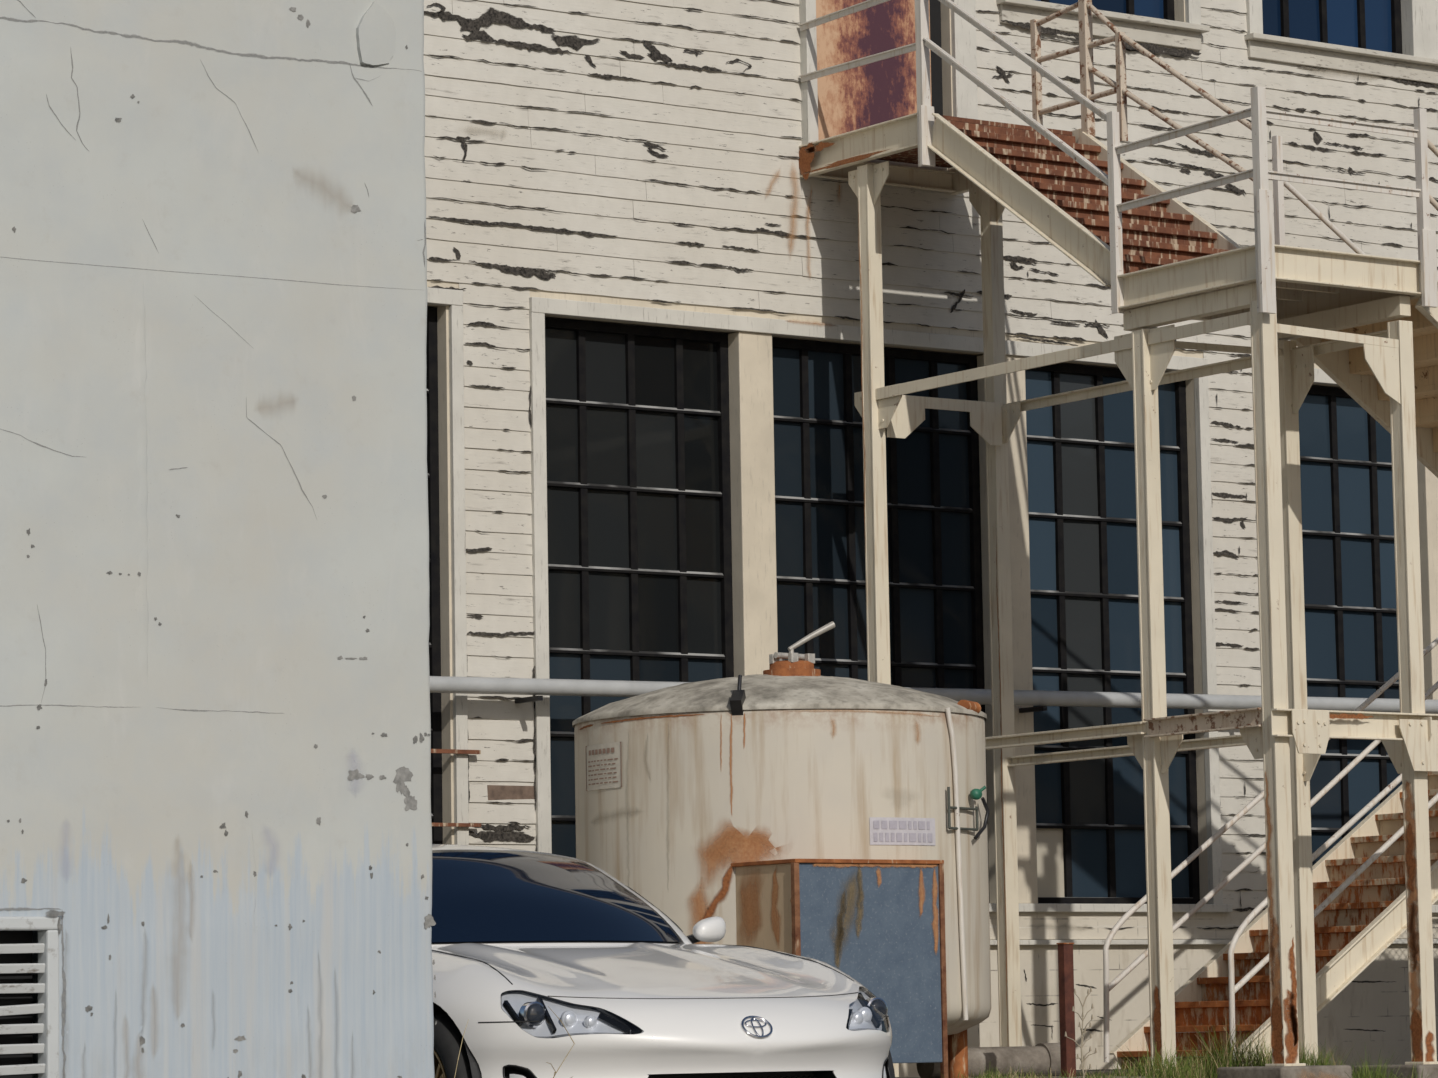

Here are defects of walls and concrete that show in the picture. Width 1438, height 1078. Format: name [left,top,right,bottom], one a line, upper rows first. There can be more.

crack [0,0,419,151]
peeling [424,3,801,101]
peeling [976,8,1438,246]
peeling [426,197,615,237]
peeling [428,247,667,365]
peeling [668,215,826,272]
peeling [1003,238,1123,346]
crack [4,430,81,457]
crack [246,405,317,519]
rust [691,713,779,924]
rust [1265,772,1299,1064]
rust [1405,782,1434,1062]